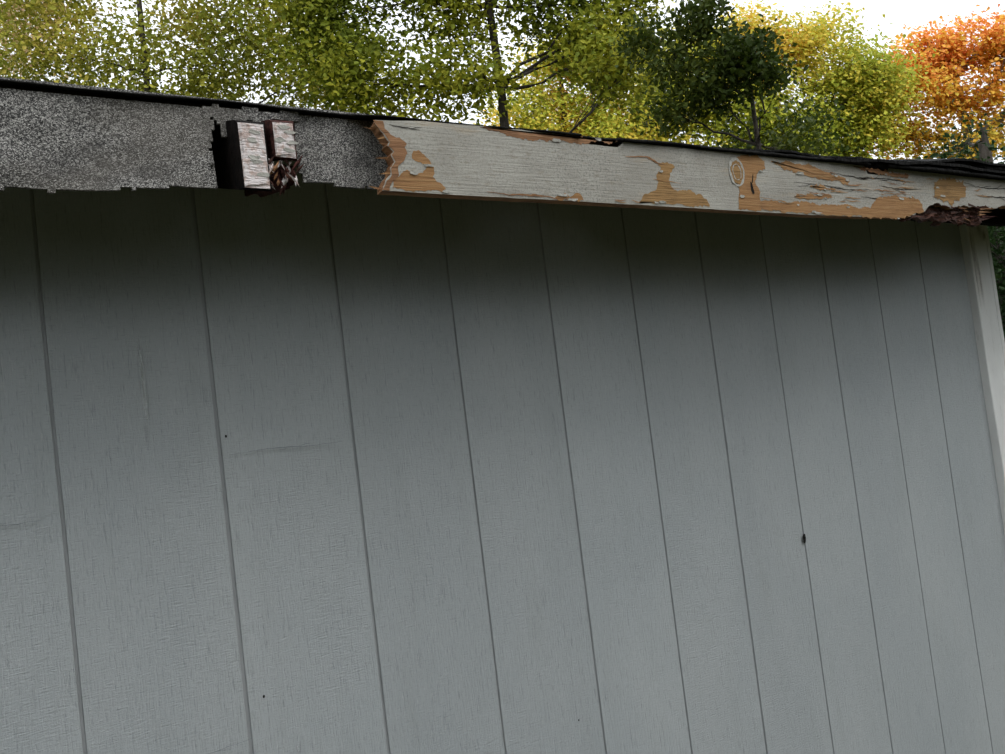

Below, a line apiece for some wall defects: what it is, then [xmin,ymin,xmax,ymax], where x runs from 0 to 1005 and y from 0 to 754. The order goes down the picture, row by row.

peeling [482,126,617,145]
peeling [393,150,450,193]
peeling [555,193,583,202]
peeling [618,162,710,207]
peeling [735,154,924,219]
peeling [929,177,989,206]